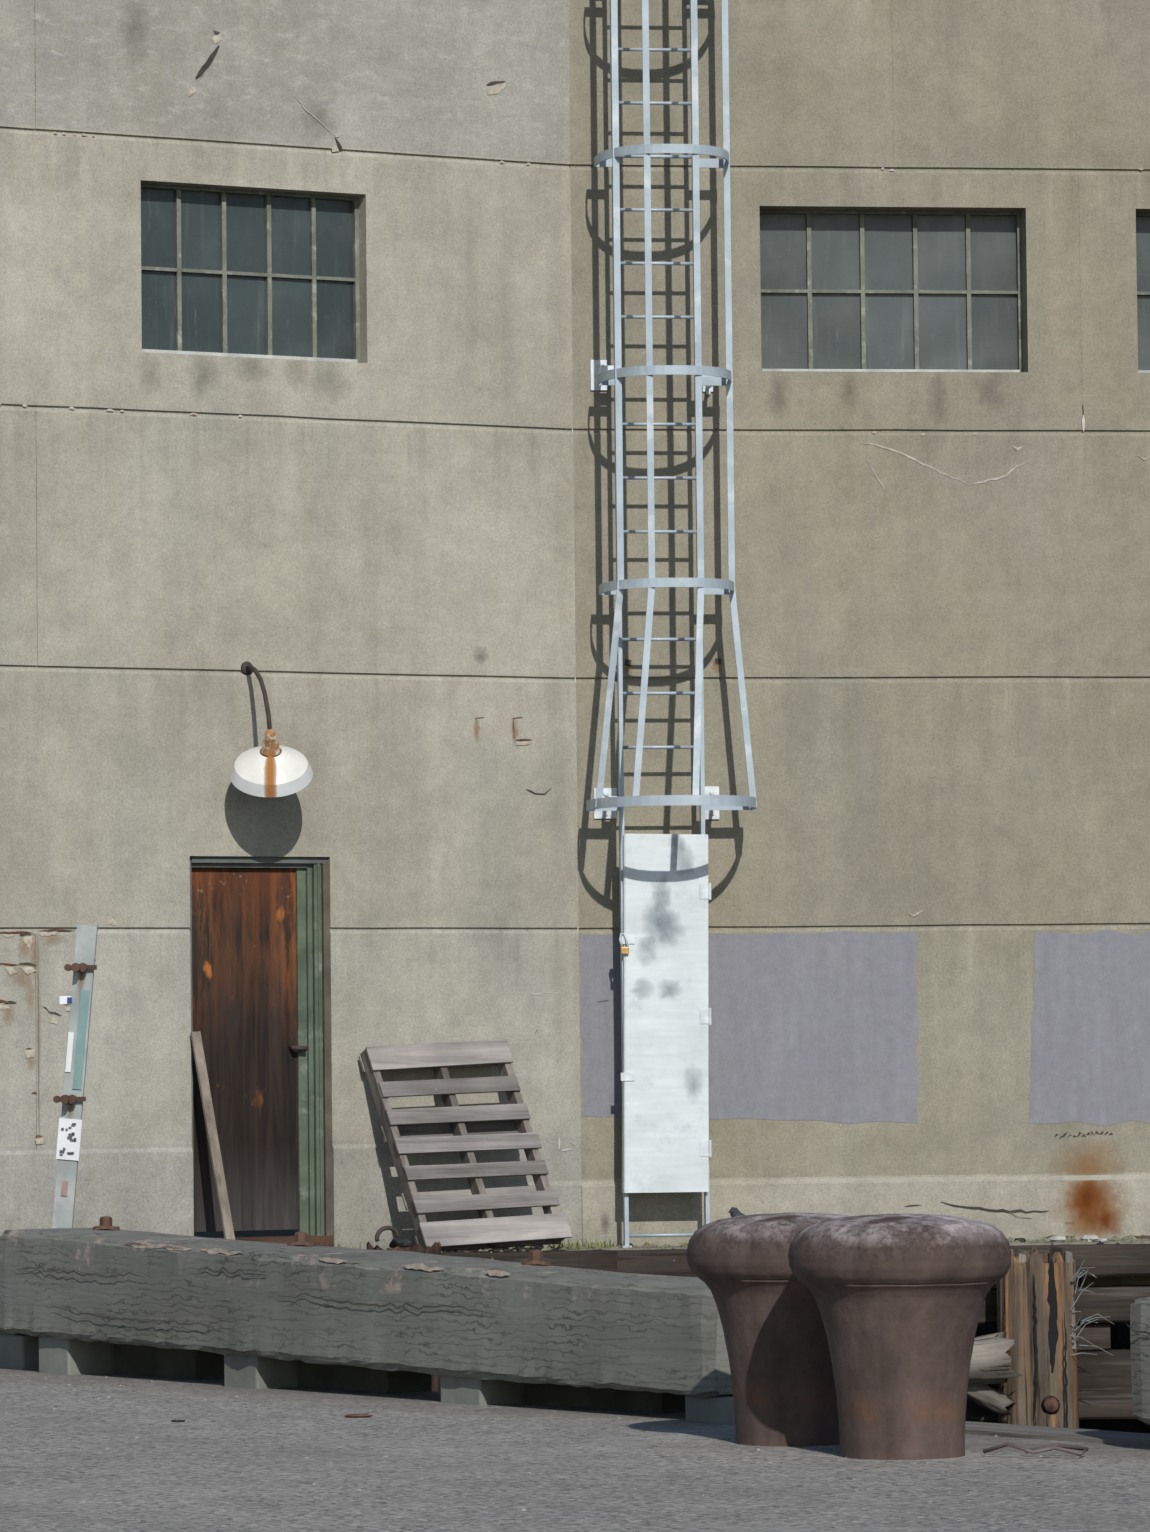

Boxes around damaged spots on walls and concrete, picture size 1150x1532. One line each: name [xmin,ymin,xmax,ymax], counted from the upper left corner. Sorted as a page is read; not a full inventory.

crack [863,443,1026,494]
spalling [0,929,75,975]
crack [905,1202,1075,1239]
rust [1075,1183,1113,1228]